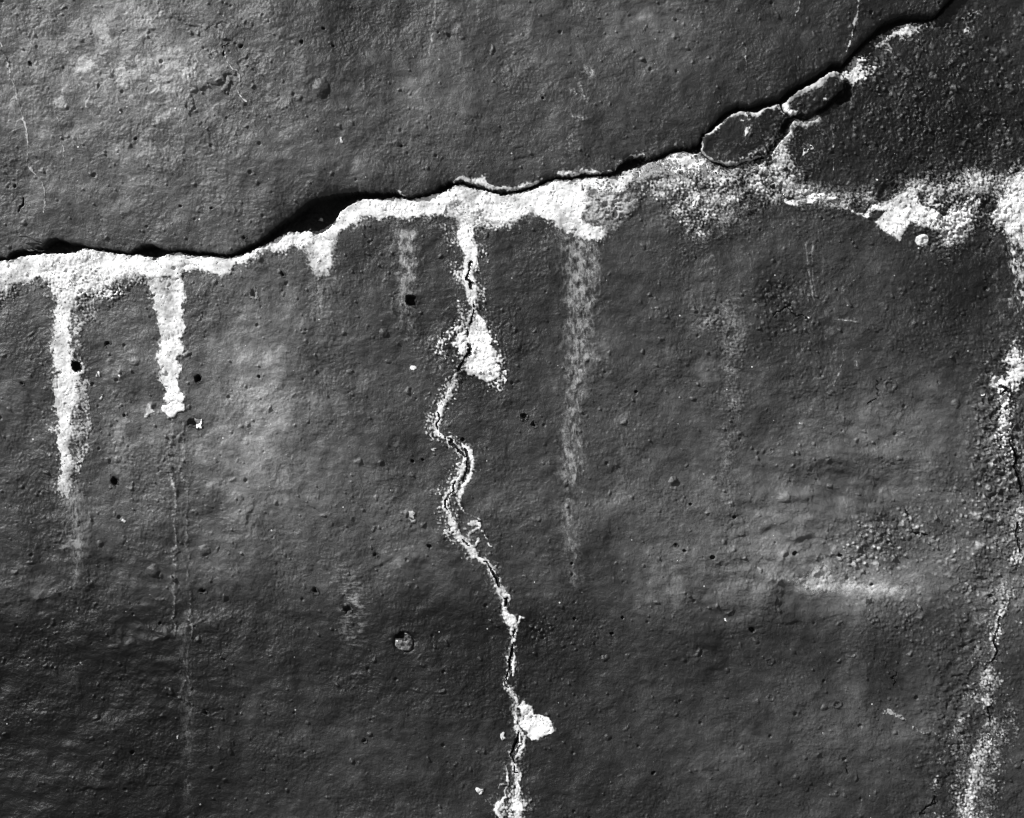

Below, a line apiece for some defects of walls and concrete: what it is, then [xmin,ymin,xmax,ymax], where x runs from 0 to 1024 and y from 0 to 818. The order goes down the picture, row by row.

damp [0,116,819,582]
crack [0,0,953,261]
crack [425,201,532,818]